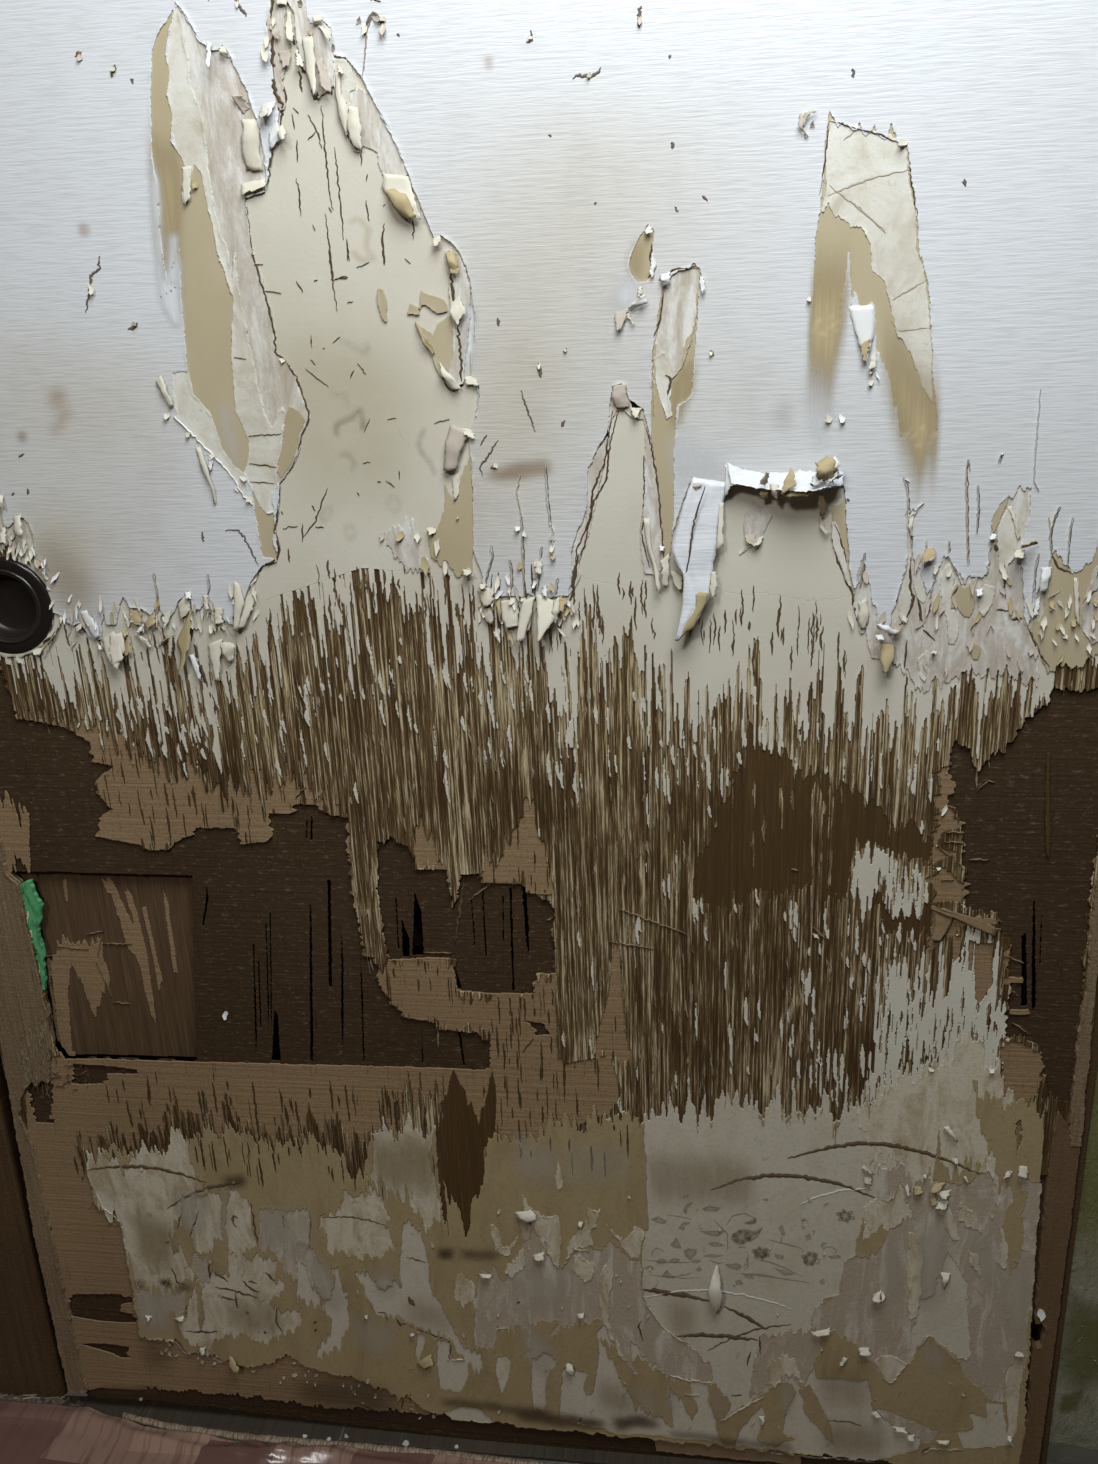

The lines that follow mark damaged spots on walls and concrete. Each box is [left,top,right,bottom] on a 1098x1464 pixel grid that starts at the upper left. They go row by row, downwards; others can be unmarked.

peeling [110,0,498,600]
peeling [569,224,1098,693]
peeling [807,112,938,474]
water stain [47,934,110,1056]
water stain [101,877,178,1023]